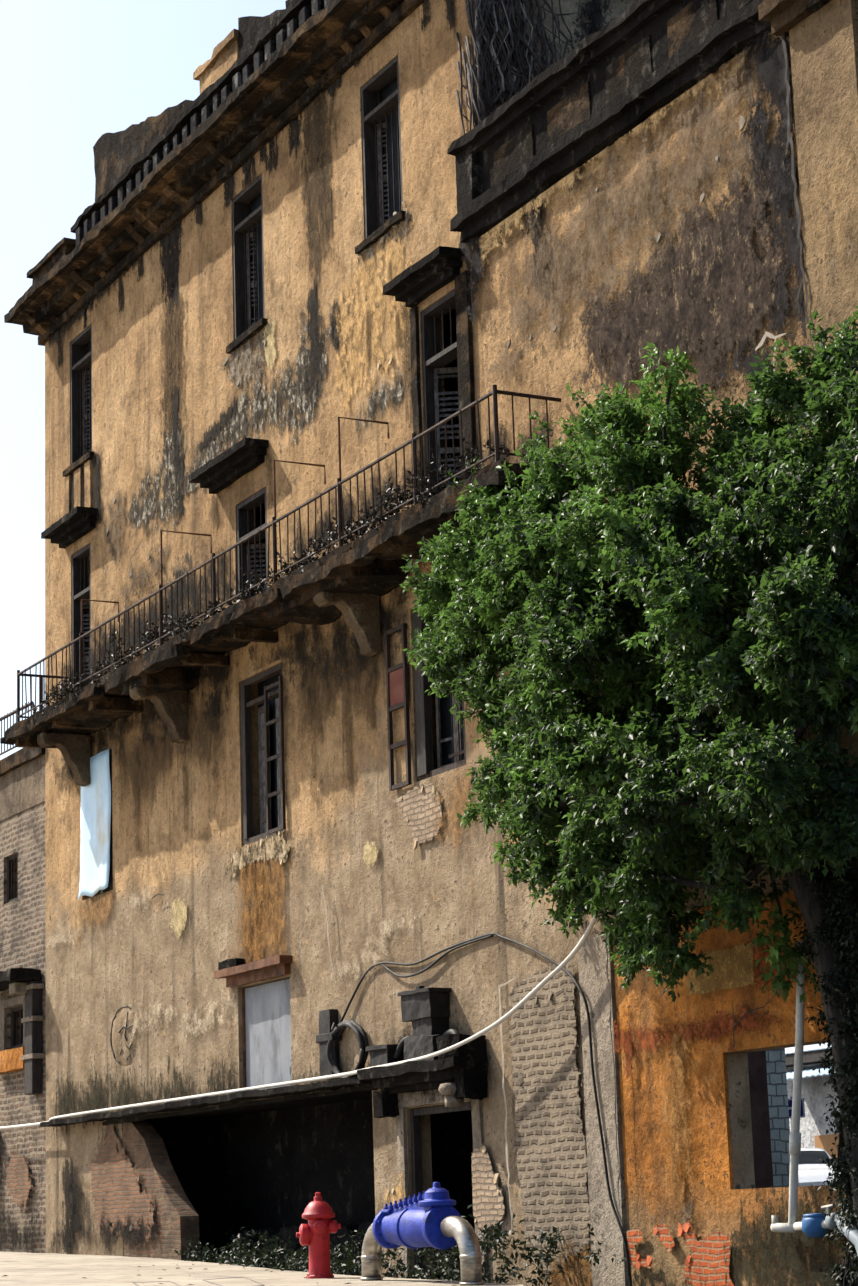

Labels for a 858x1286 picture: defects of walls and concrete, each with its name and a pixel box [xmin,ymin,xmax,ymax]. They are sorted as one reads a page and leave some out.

water stain [421,0,455,32]
water stain [570,30,807,409]
water stain [49,41,359,537]
water stain [355,302,412,434]
water stain [89,552,235,683]
spalling [225,830,291,878]
spalling [394,782,442,851]
flaking render [89,1124,159,1242]
water stain [47,1045,235,1141]
flaking render [471,960,590,1281]
rust [613,922,795,1212]
flaking render [626,1222,734,1286]